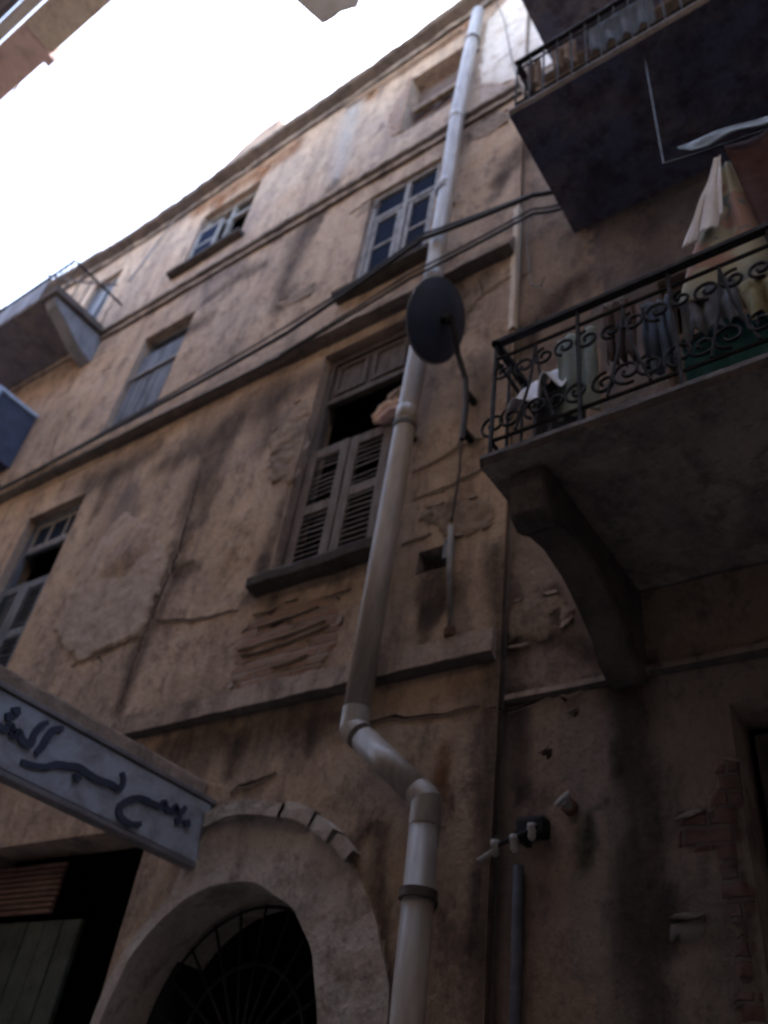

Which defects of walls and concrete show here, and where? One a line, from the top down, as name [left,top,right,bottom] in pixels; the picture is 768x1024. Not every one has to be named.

crack [71,448,238,711]
water stain [85,374,313,714]
spalling [228,596,343,689]
crack [369,705,480,725]
spalling [668,911,720,944]